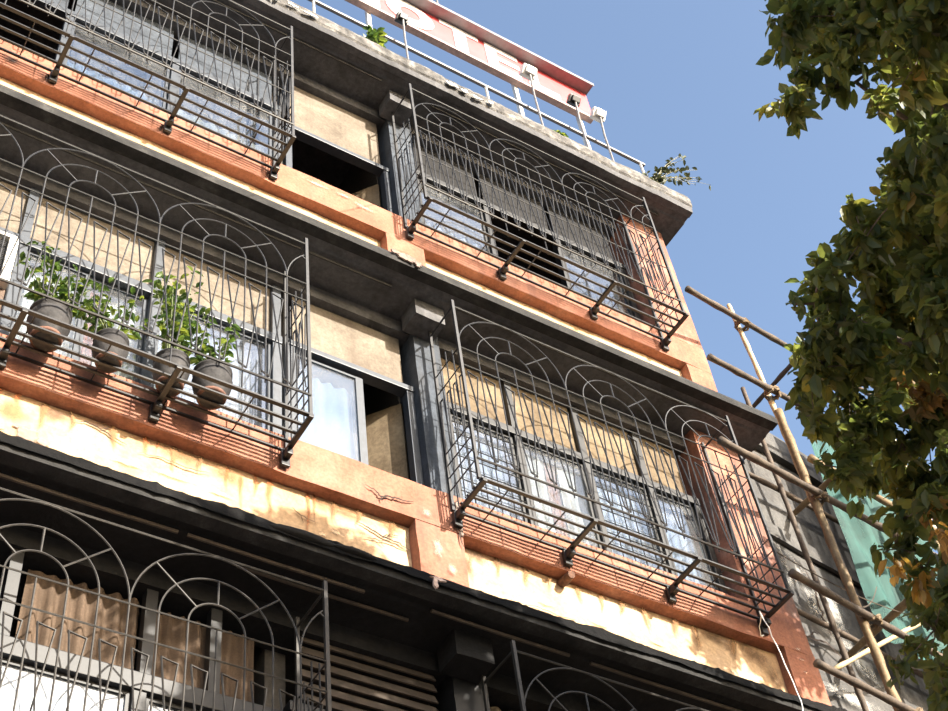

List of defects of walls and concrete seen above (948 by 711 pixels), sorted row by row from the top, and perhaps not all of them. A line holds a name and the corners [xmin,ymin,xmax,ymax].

flaking render [13,423,50,446]
crack [365,484,414,502]
crack [358,522,409,551]